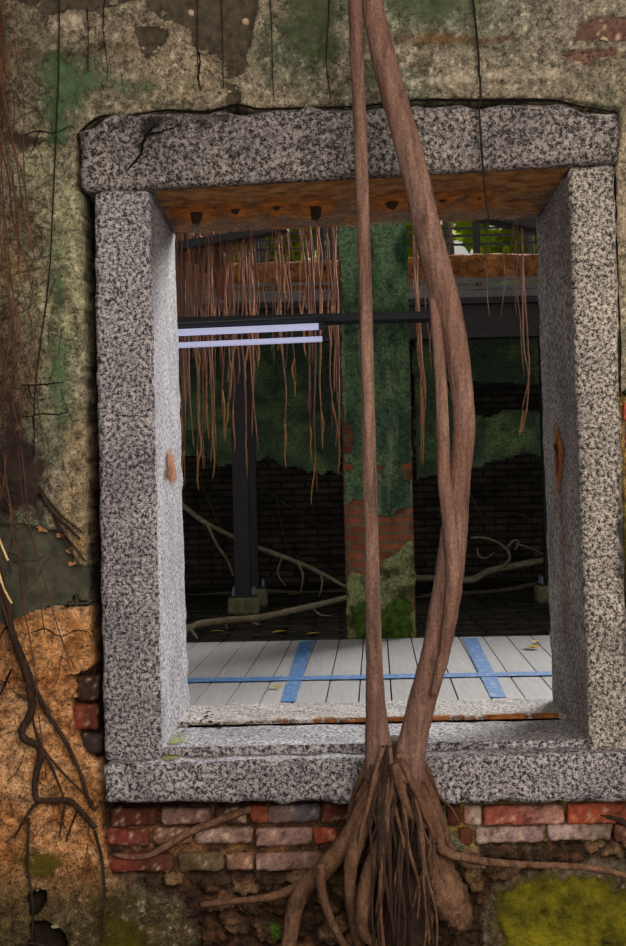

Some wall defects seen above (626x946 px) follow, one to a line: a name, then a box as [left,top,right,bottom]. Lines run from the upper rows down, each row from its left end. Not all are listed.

flaking render [570,18,624,64]
crack [22,48,382,171]
crack [409,98,617,113]
flaking render [468,338,540,385]
corrosion [166,451,177,483]
flaking render [472,409,541,467]
corrosion [553,426,563,492]
flaking render [70,670,105,753]
flaking render [447,801,626,845]